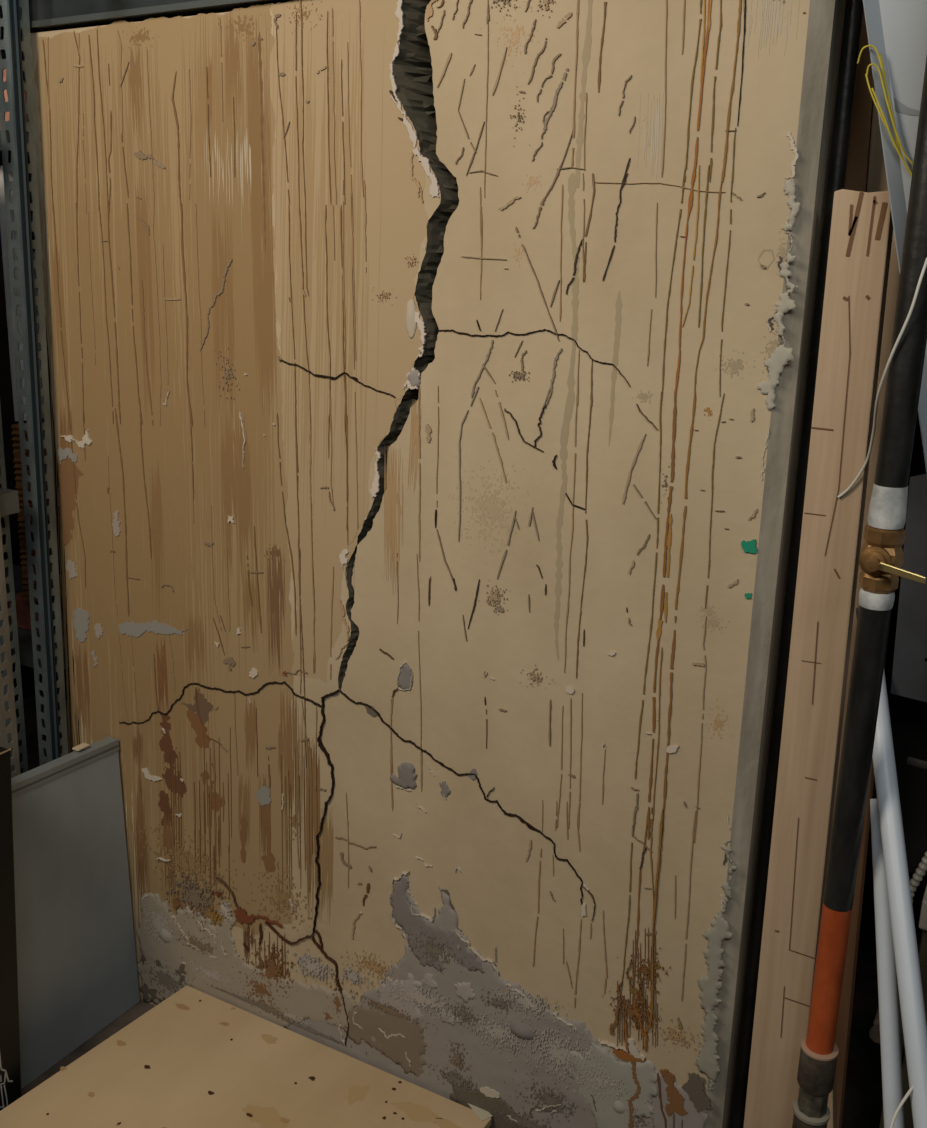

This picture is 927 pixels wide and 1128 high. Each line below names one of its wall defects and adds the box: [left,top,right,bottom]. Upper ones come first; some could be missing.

water stain [637,0,668,179]
water stain [647,203,658,366]
spalling [757,132,801,411]
water stain [34,0,654,1128]
crack [119,0,658,1046]
corrosion [595,0,746,1128]
corrosion [132,637,307,1012]
spalling [136,871,709,1128]
spalling [695,813,737,1091]